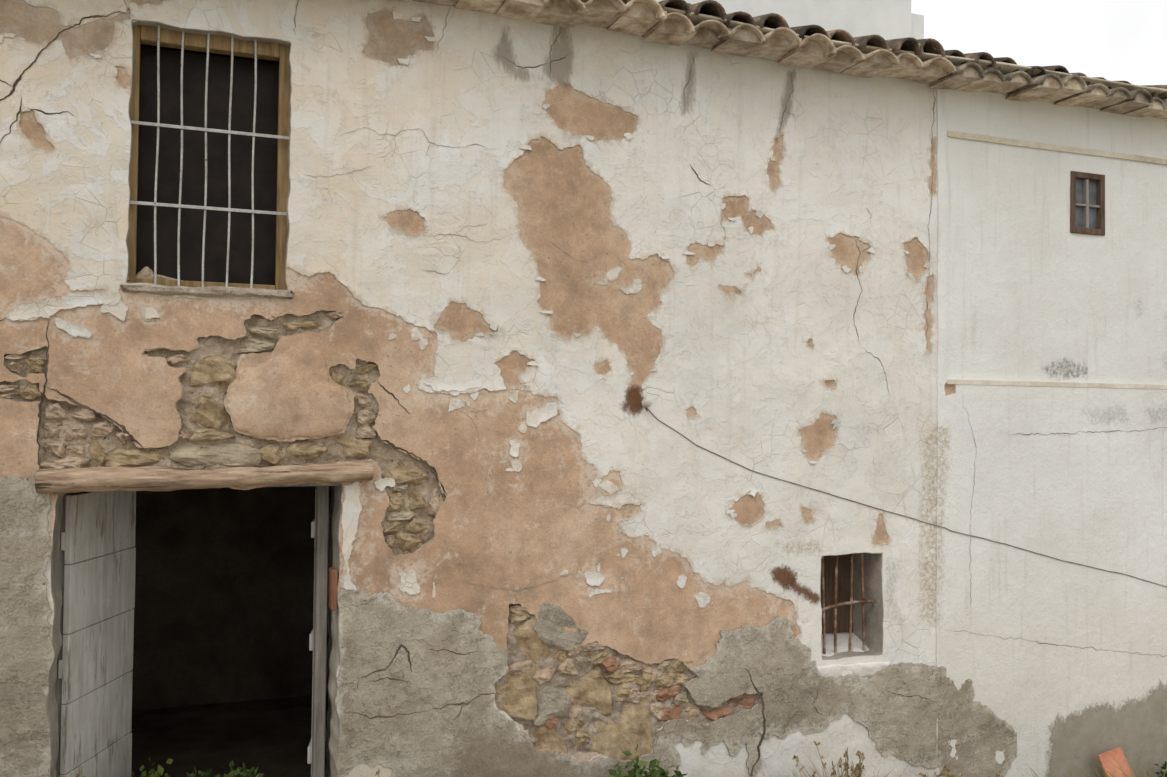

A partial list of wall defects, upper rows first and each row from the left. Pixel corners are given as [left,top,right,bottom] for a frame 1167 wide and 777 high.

crack [0,0,128,143]
flaking render [383,209,425,235]
flaking render [504,83,674,396]
flaking render [721,195,772,235]
flaking render [828,233,876,275]
flaking render [903,237,934,351]
crack [925,89,936,348]
flaking render [0,216,801,683]
flaking render [798,413,841,464]
crack [348,644,498,719]
crack [709,668,766,776]
leakage [1045,681,1167,777]